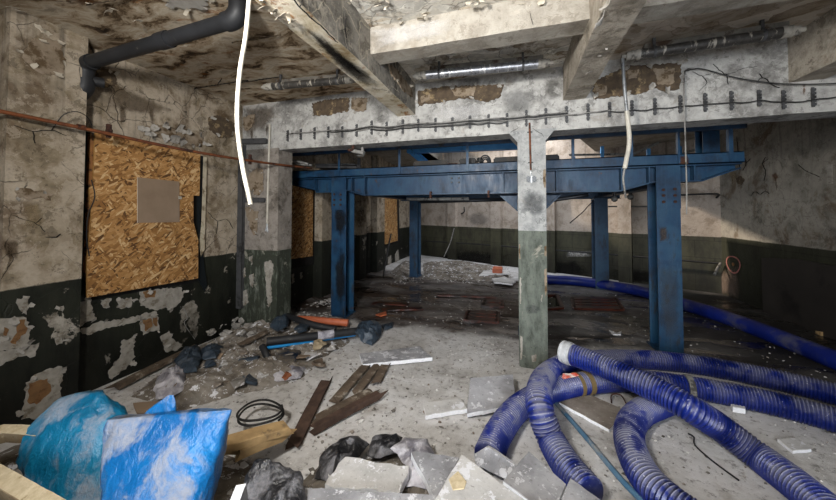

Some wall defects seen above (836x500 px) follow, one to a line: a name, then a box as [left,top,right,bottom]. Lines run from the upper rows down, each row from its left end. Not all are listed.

spalling [312,96,370,116]
spalling [387,63,504,107]
spalling [586,58,688,100]
crack [14,125,67,143]
peeling [137,114,255,148]
water stain [5,242,17,266]
peeling [264,260,274,307]
peeling [0,296,39,366]
peeling [80,287,189,379]
flaking render [405,324,523,411]
peeling [15,366,67,420]